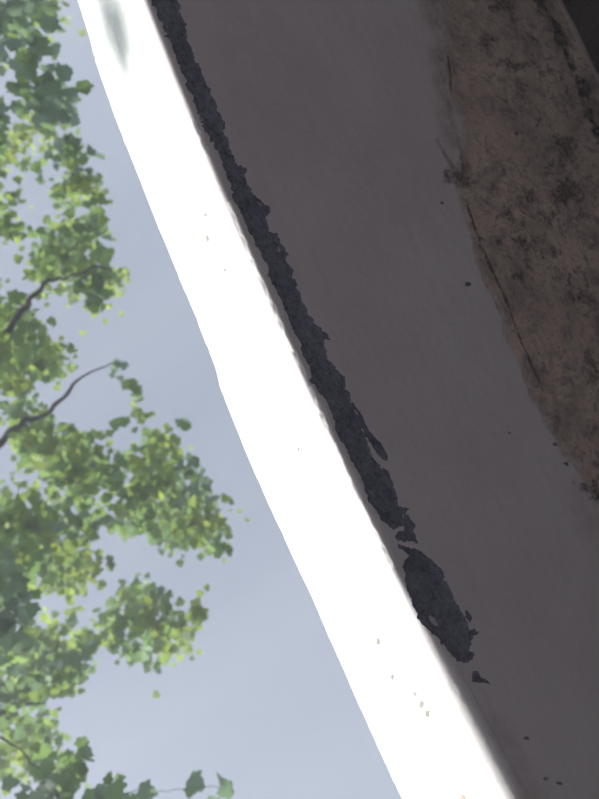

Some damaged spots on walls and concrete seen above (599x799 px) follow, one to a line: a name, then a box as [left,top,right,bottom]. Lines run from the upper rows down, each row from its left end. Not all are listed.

spalling [151,0,478,663]
spalling [472,671,490,684]